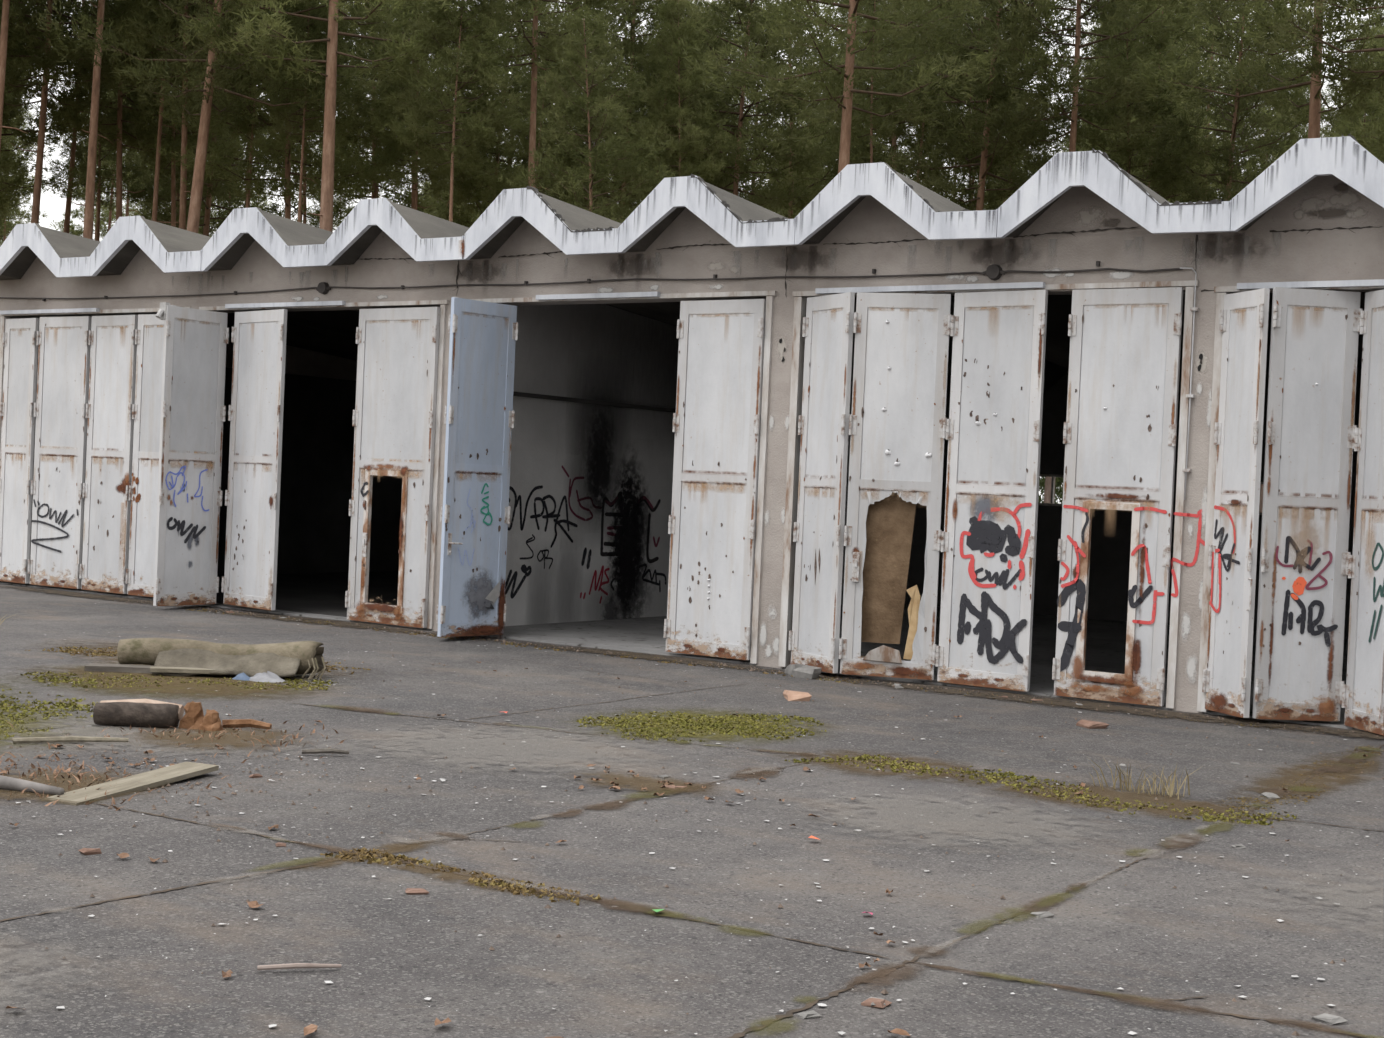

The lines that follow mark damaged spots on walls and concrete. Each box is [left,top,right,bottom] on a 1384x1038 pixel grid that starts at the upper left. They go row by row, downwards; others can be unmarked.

rust [0,473,271,611]
rust [352,446,418,557]
rust [349,562,422,628]
water stain [582,405,644,611]
crack [390,659,836,784]
rust [667,631,746,660]
rust [1056,640,1160,706]
rust [1064,482,1154,507]
rust [1260,549,1277,682]
rust [1205,631,1384,736]
crack [0,802,590,921]
crack [675,744,1384,1038]